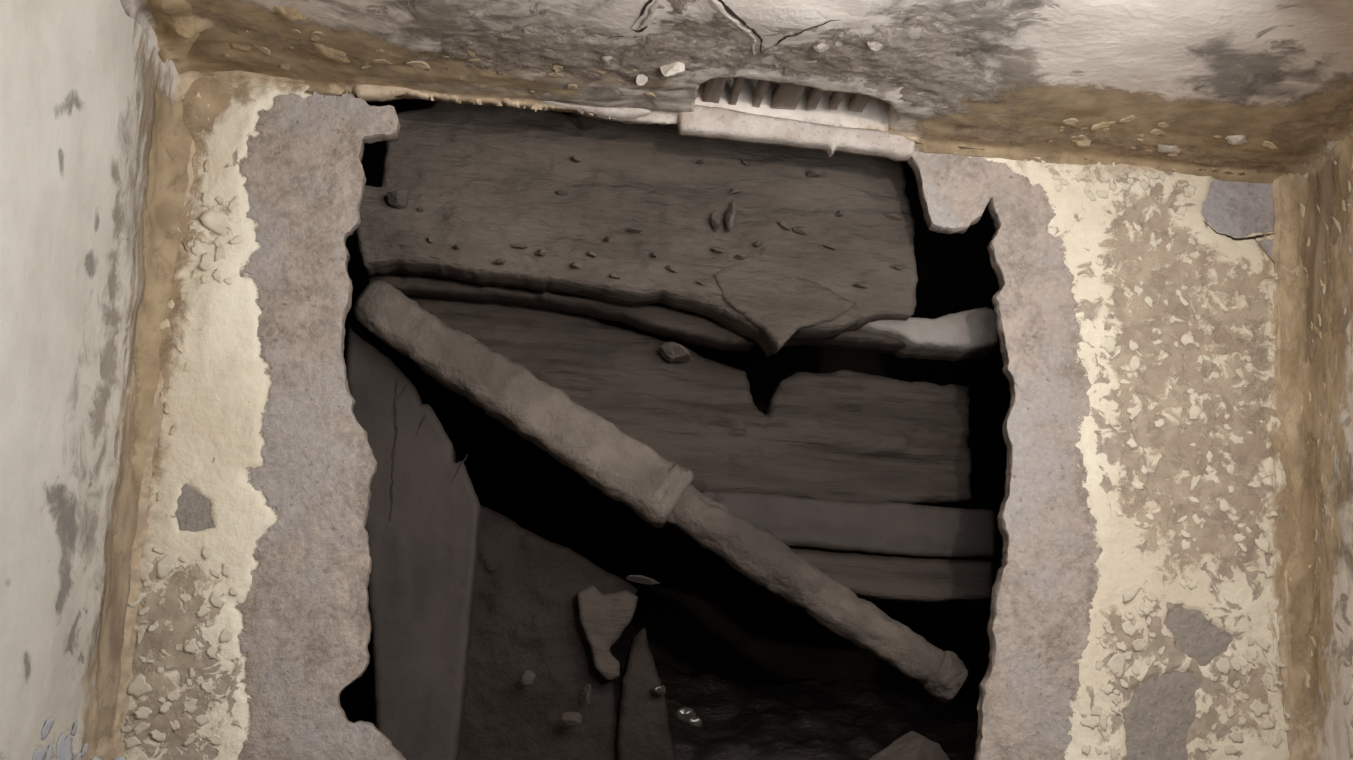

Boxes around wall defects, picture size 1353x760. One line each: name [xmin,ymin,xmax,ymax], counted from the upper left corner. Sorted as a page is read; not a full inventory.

crack [630,0,664,33]
crack [708,0,837,55]
leakage [973,0,1045,92]
leakage [1193,42,1303,102]
leakage [96,166,121,237]
peeling [1299,154,1353,236]
leakage [91,253,121,439]
spalling [32,91,924,760]
spalling [593,115,1292,760]